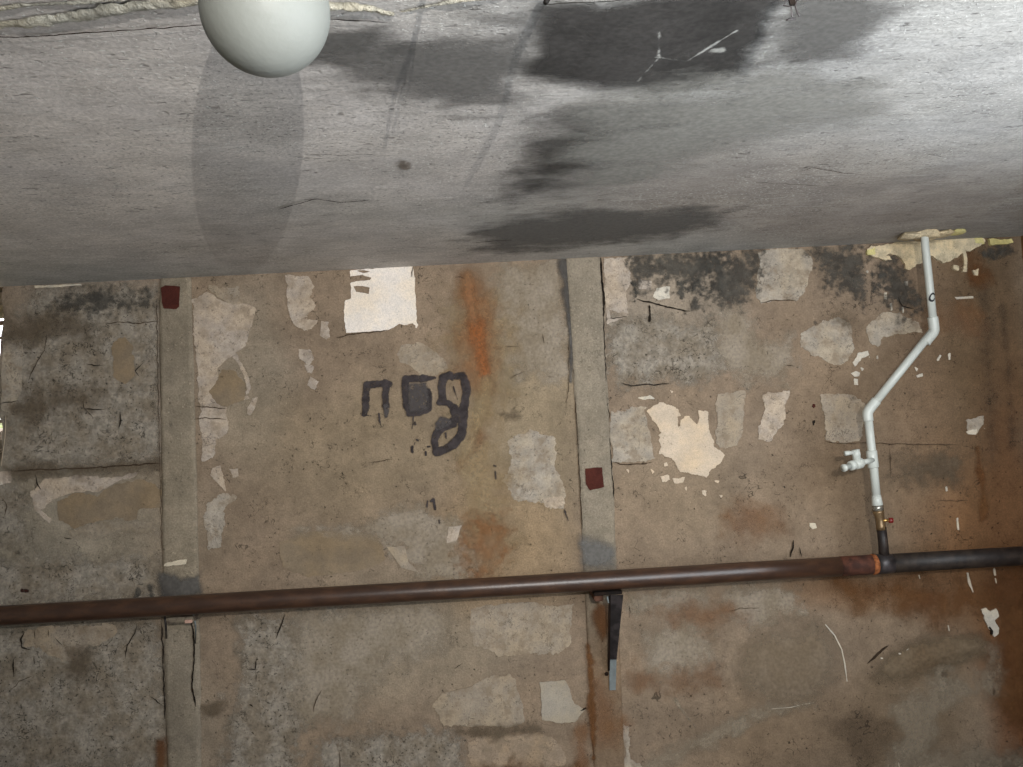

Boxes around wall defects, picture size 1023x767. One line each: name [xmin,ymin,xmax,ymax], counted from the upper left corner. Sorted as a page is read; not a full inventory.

water stain [625,249,765,322]
water stain [797,244,923,321]
peeling [0,283,161,606]
flaking render [192,285,258,550]
rust [463,273,491,458]
flaking render [504,429,566,509]
peeling [603,248,923,491]
flaking render [980,607,999,637]
rust [586,644,596,759]